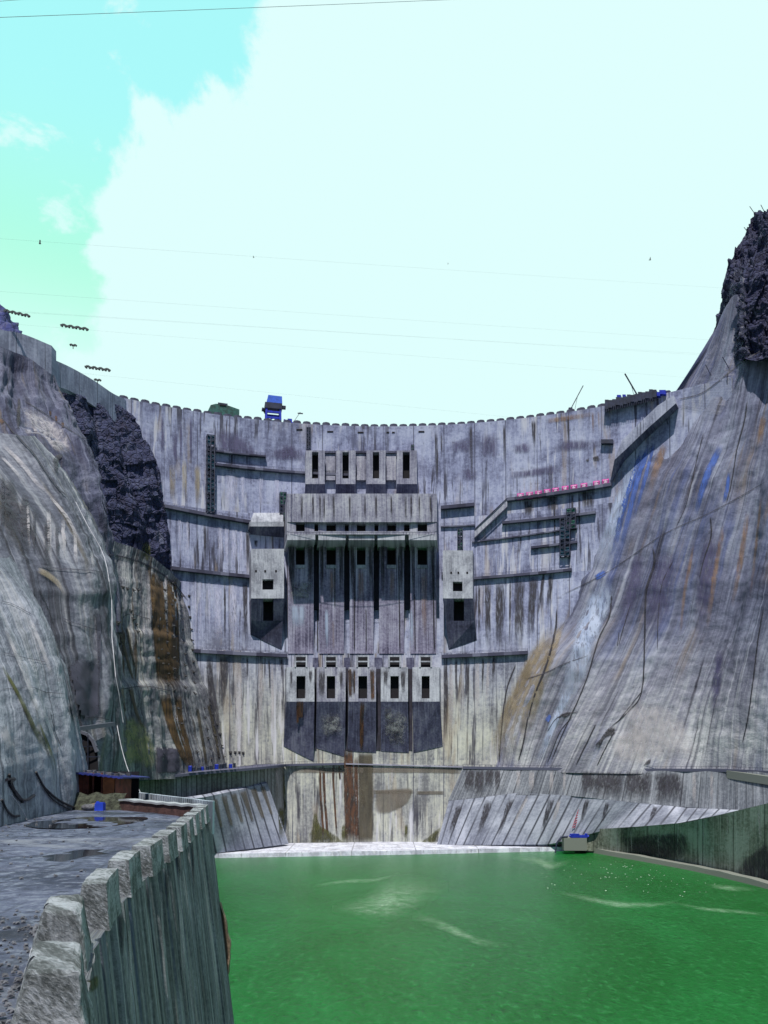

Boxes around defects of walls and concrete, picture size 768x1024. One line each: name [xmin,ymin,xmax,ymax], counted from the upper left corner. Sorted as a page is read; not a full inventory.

leakage [455,428,472,479]
leakage [485,423,535,455]
leakage [519,468,553,476]
leakage [563,419,586,449]
leakage [571,491,594,540]
leakage [478,575,554,631]
leakage [571,592,609,673]
leakage [545,695,569,743]
rust [343,671,374,838]
leakage [206,774,287,829]